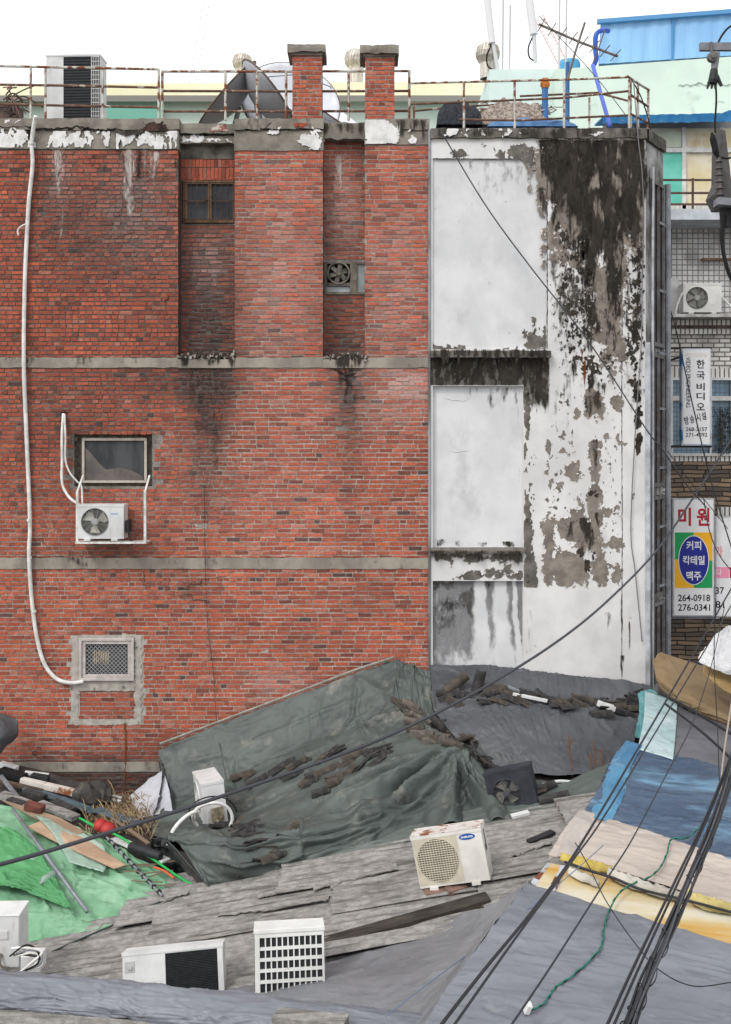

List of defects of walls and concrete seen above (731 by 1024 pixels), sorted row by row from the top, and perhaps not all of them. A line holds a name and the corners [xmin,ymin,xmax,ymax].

peeling [0,120,232,149]
peeling [294,123,322,150]
peeling [365,119,417,144]
damp [118,140,159,214]
damp [519,128,649,405]
damp [335,354,361,394]
damp [431,349,549,409]
peeling [433,128,645,589]
damp [585,374,606,416]
damp [568,512,599,549]
damp [433,581,494,665]
damp [507,581,522,646]